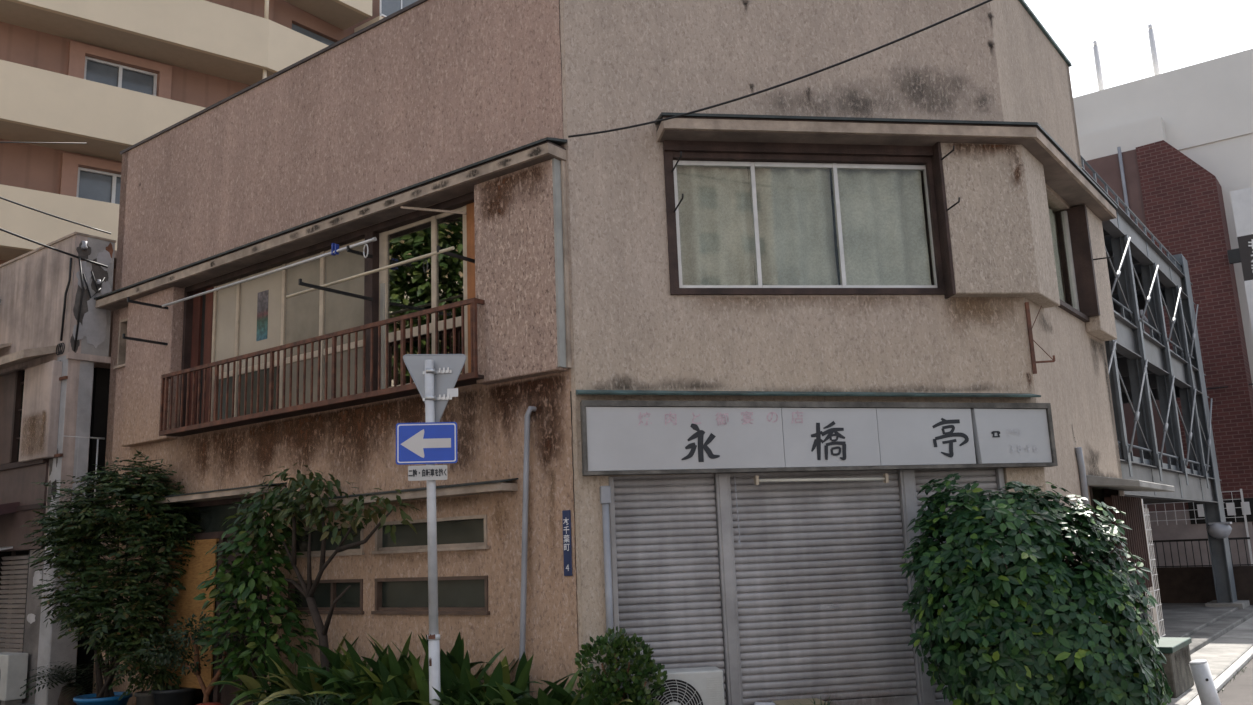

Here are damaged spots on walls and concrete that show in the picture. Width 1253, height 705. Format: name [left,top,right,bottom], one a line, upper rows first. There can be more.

water stain [484,167,541,216]